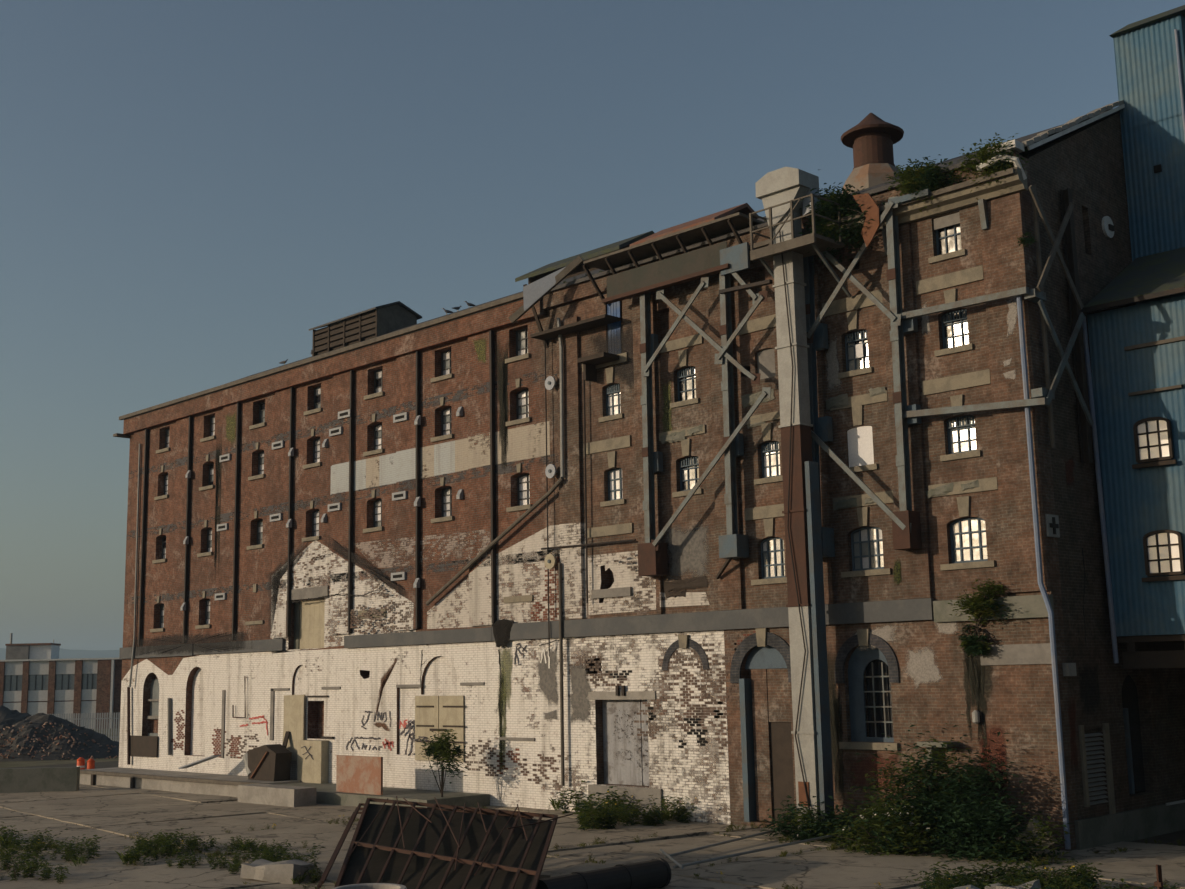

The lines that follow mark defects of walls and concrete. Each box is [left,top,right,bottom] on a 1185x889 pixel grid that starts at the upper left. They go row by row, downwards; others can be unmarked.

peeling [295,548,331,588]
peeling [329,574,411,635]
spalling [491,619,513,647]
peeling [530,556,560,622]
spalling [538,649,632,723]
peeling [614,629,756,786]